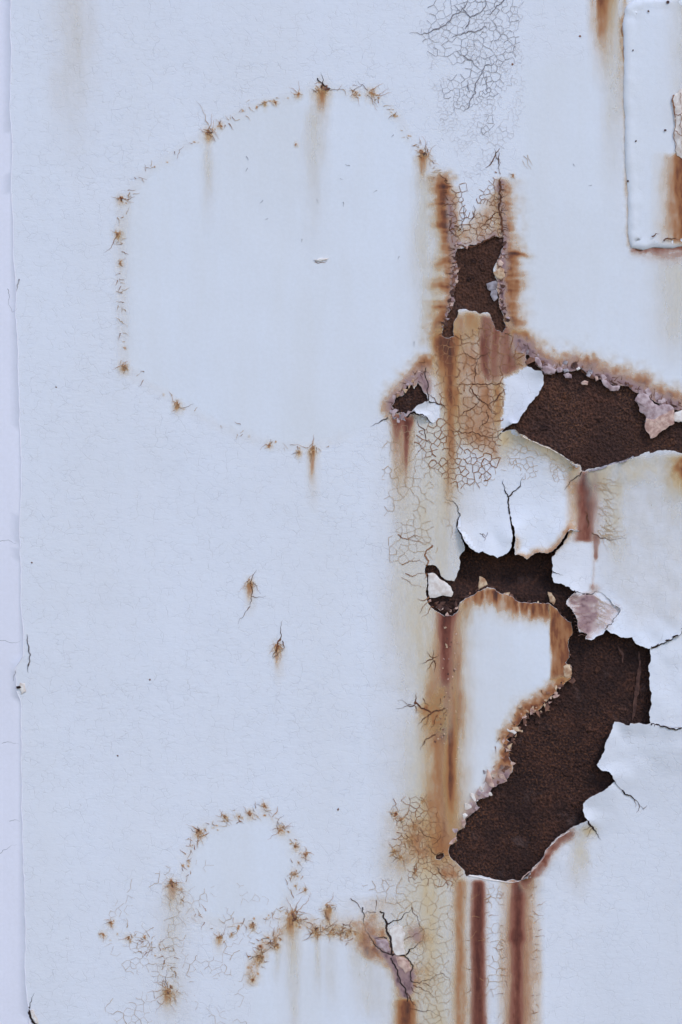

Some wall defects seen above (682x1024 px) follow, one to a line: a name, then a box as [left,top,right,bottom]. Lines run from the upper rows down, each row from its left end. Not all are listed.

corrosion [289,76,337,107]
corrosion [596,0,625,61]
crack [114,0,682,618]
peeling [374,368,442,426]
peeling [438,178,511,340]
corrosion [381,139,682,559]
corrosion [240,574,265,618]
corrosion [271,627,285,661]
peeling [425,349,682,936]
corrosion [389,585,610,1024]
corrosion [248,886,351,964]
crack [362,795,546,1024]